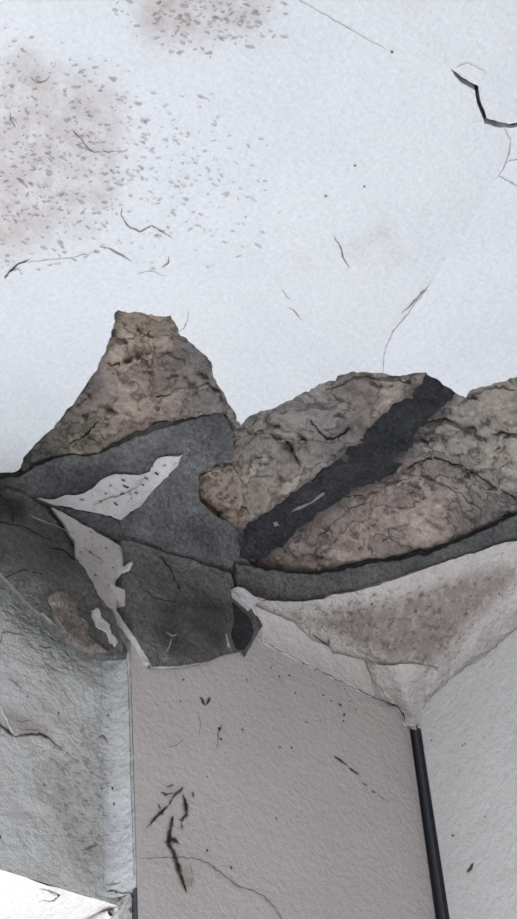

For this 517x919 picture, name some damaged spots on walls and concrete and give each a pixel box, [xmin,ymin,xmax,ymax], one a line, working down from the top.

crack [470,64,485,118]
flaking render [0,310,517,697]
crack [99,672,282,919]